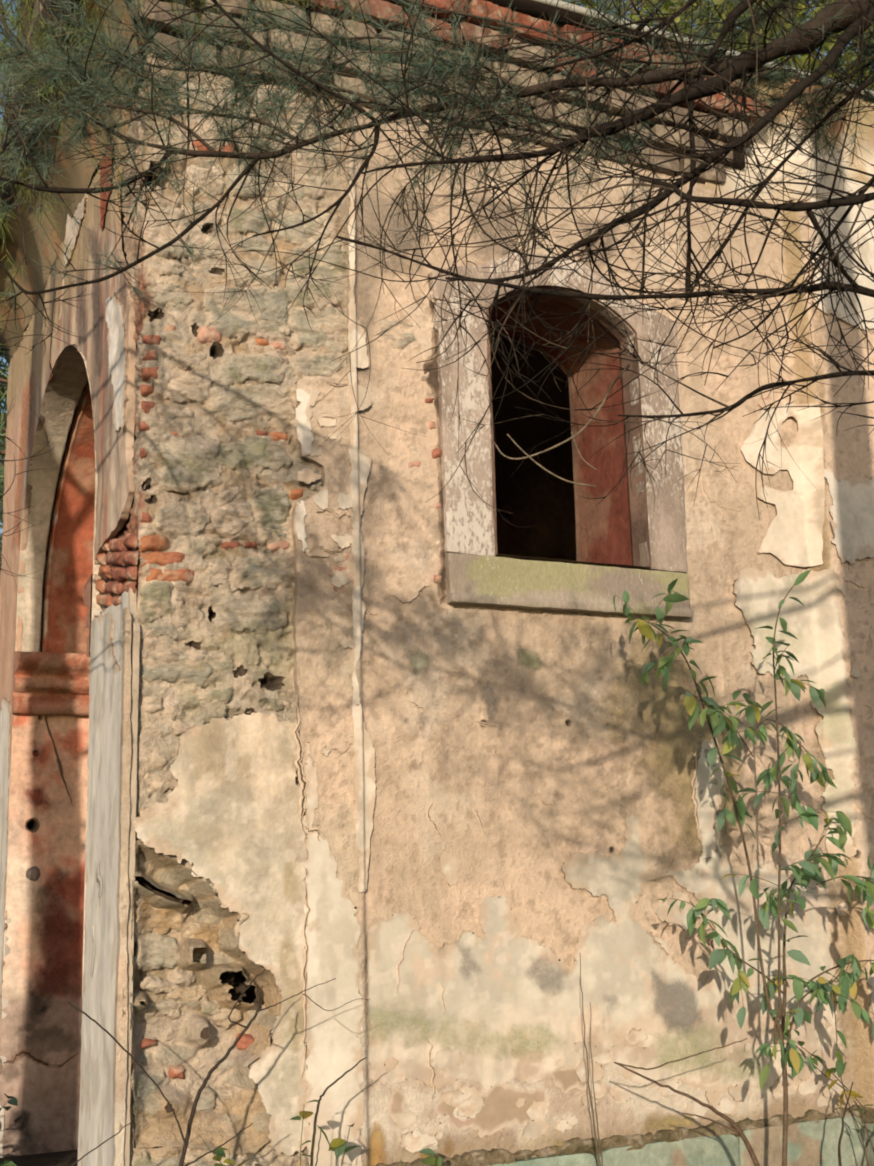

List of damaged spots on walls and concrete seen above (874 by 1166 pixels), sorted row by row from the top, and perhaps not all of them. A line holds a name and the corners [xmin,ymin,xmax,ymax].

peeling [63,194,88,267]
flaking render [374,319,417,349]
flaking render [408,273,447,604]
flaking render [80,53,376,1166]
peeling [732,398,874,861]
peeling [365,738,837,1140]
leakage [24,953,68,1030]
crack [3,1049,79,1068]
leakage [8,1111,29,1136]
peeling [387,1090,443,1153]